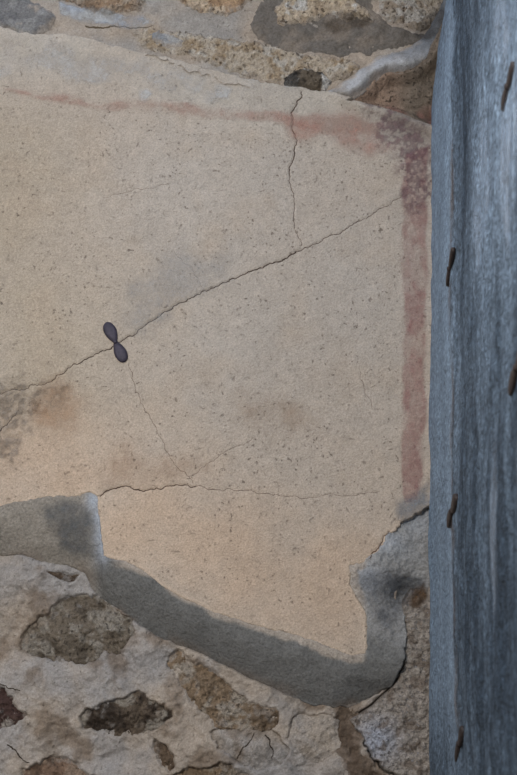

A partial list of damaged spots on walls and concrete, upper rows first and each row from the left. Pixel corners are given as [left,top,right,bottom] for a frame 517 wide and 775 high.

flaking render [0,0,412,91]
flaking render [274,0,443,34]
crack [4,92,399,393]
crack [100,362,374,499]
flaking render [0,555,430,775]